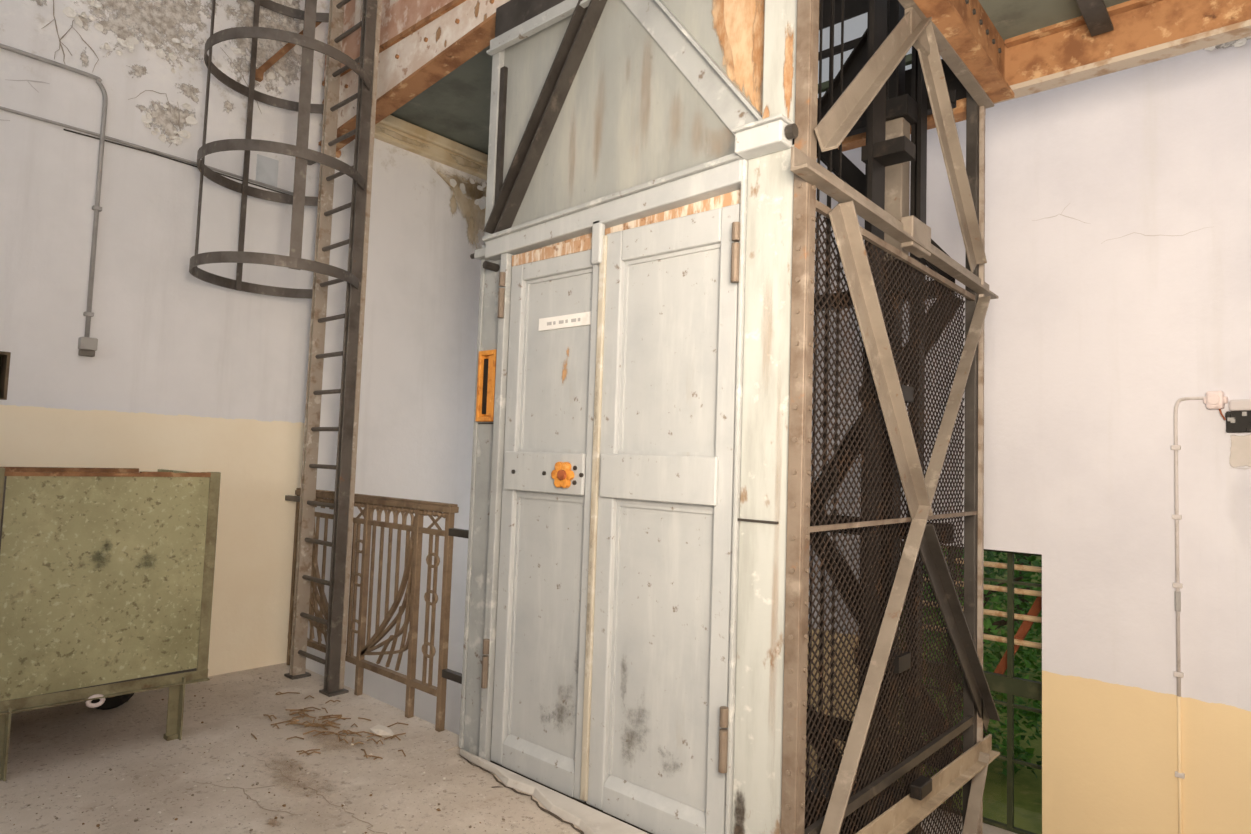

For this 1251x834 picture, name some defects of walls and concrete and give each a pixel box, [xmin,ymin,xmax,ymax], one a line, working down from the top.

flaking render [59,0,304,145]
flaking render [450,176,486,210]
crack [193,756,387,834]
crack [459,754,584,834]